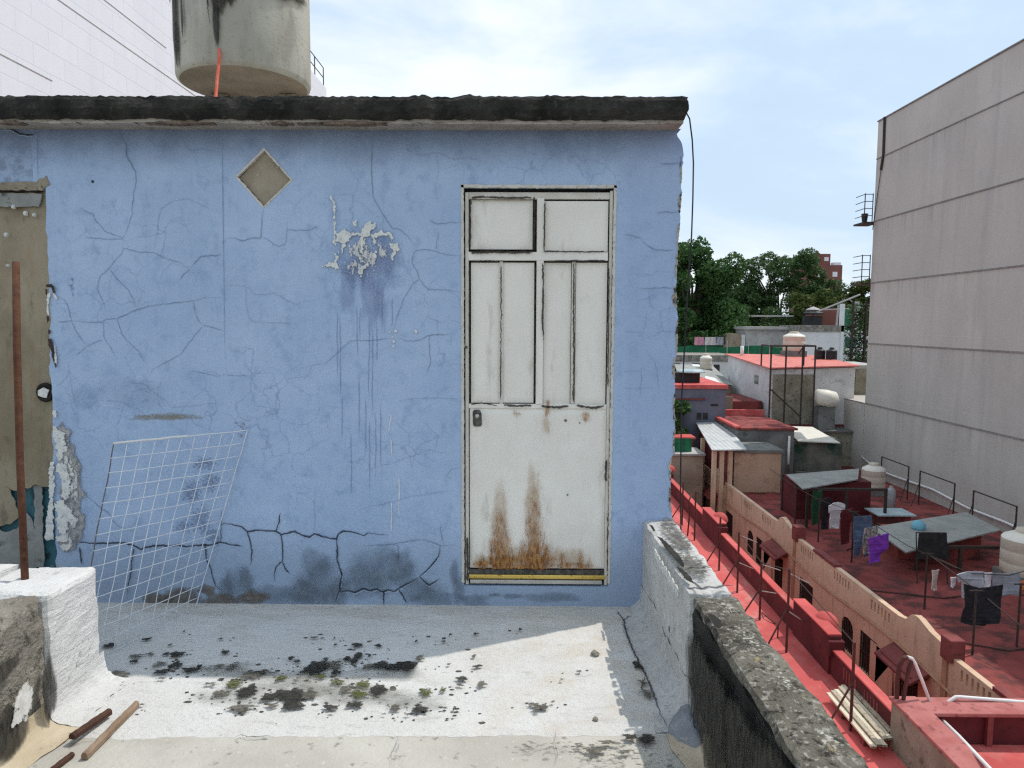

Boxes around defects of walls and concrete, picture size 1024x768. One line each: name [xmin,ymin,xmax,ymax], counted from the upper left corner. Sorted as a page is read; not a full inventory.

water stain [169,0,183,67]
water stain [211,0,233,44]
peeling [321,196,400,277]
flaking render [44,410,86,552]
crack [79,513,440,604]
rust [473,491,590,570]
crack [618,612,666,724]